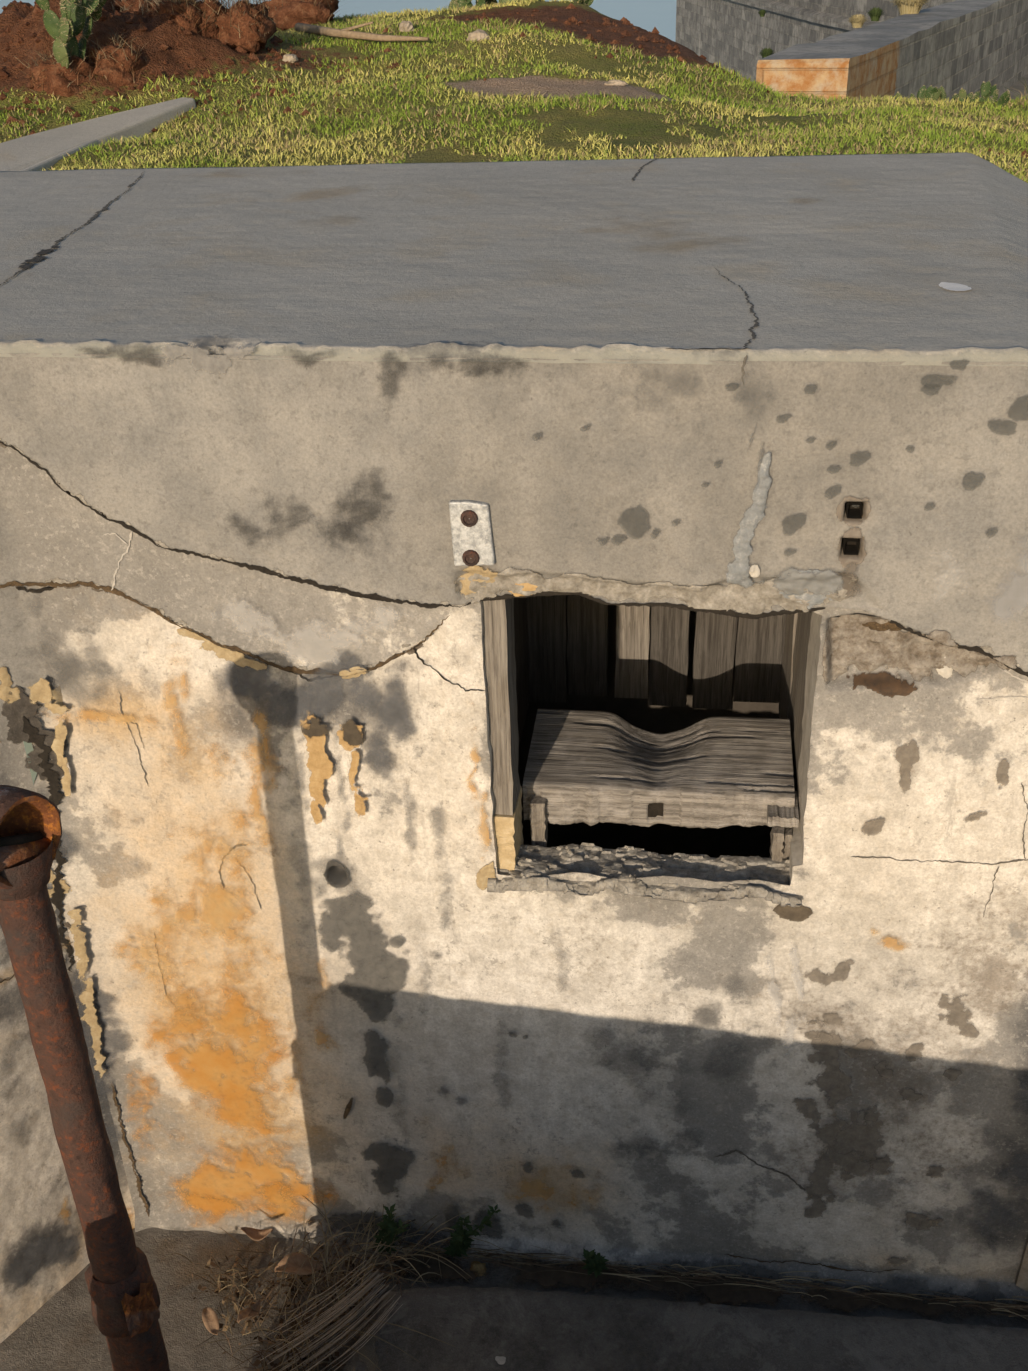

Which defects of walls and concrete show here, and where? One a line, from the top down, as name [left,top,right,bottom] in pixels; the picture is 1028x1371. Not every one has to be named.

crack [666,267,759,385]
crack [0,438,825,692]
spalling [0,667,71,797]
rust [235,713,273,845]
leakage [223,653,414,770]
spalling [454,565,1017,698]
crack [889,620,1028,702]
peeling [48,870,72,898]
rust [119,840,335,1222]
leakage [317,893,408,1108]
leakage [362,1143,415,1197]
rust [121,1282,160,1337]